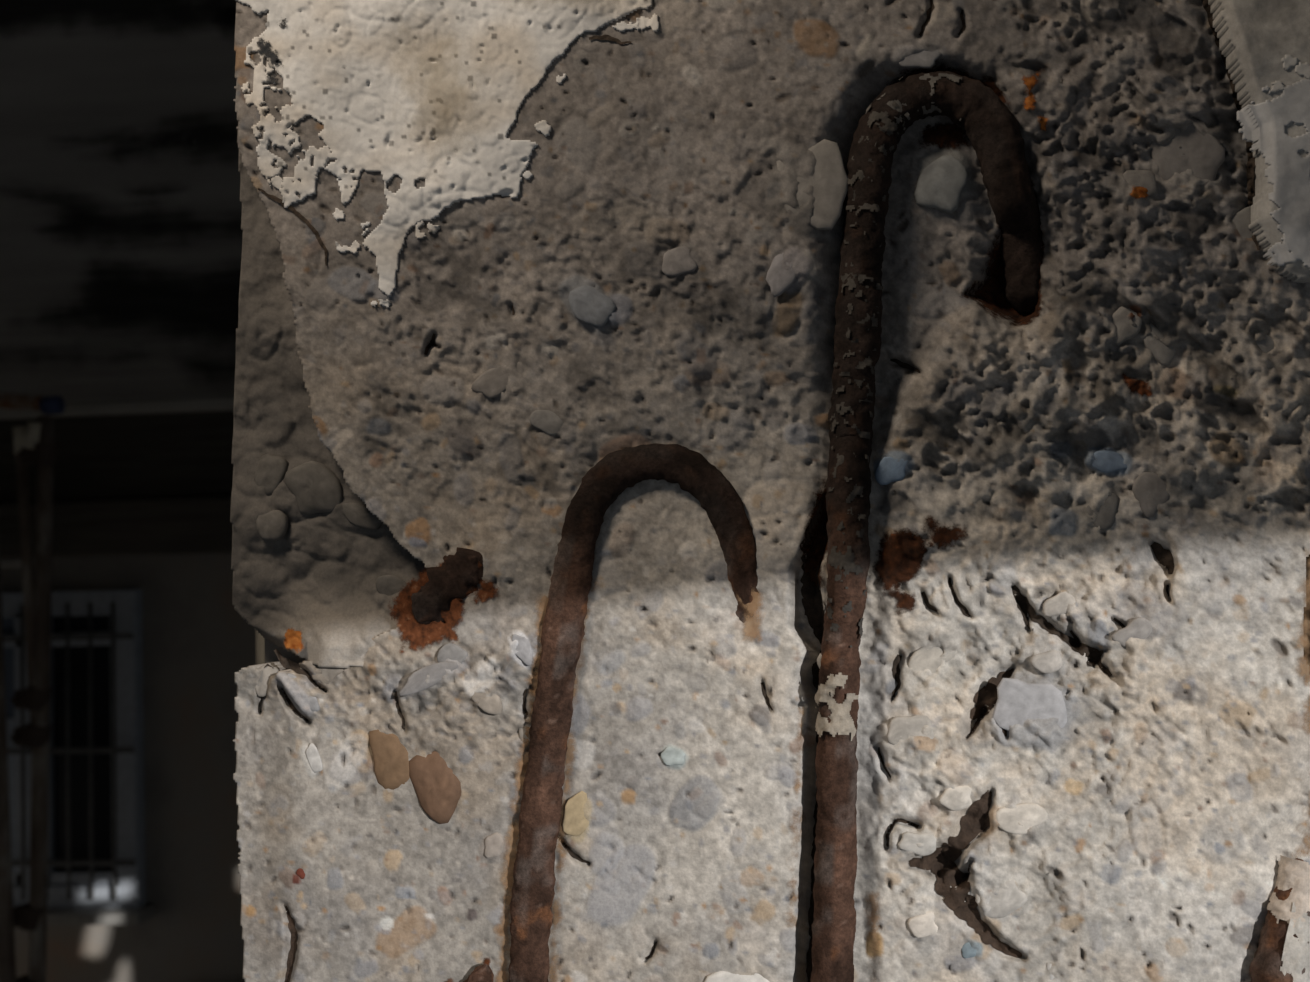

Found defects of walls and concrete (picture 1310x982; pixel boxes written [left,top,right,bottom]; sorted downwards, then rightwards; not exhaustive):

peeling [235,0,659,296]
corrosion [890,65,1048,131]
peeling [1208,0,1310,108]
peeling [1237,54,1310,270]
corrosion [961,224,1045,326]
spalling [230,149,425,668]
corrosion [388,562,499,653]
corrosion [483,595,549,982]
spalling [506,443,758,982]
corrosion [801,479,828,588]
corrosion [873,516,968,614]
spalling [810,71,1048,982]